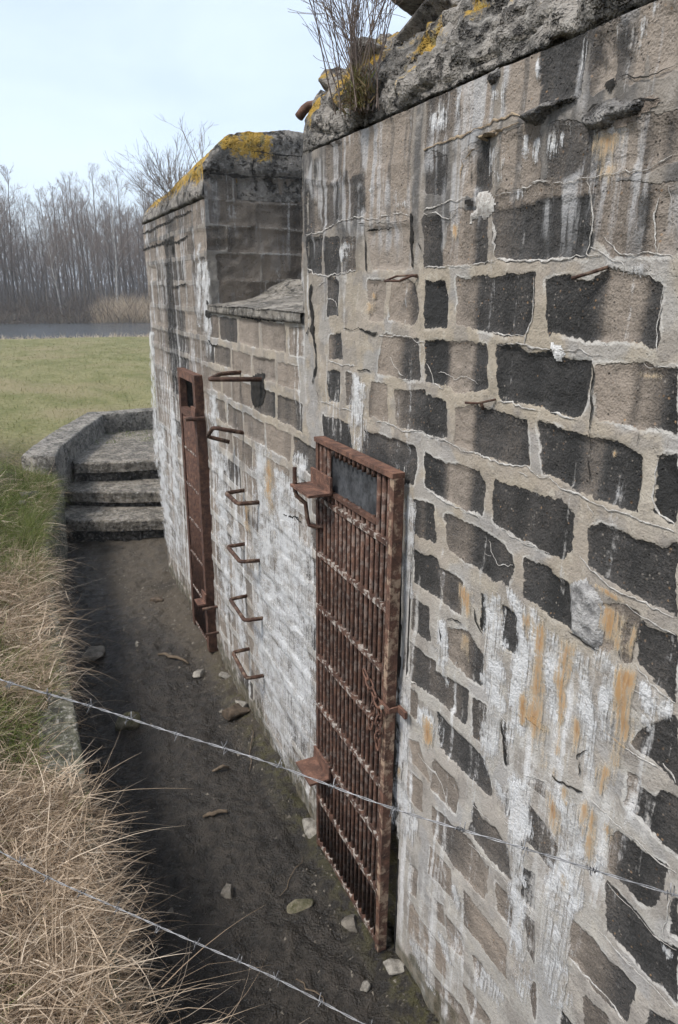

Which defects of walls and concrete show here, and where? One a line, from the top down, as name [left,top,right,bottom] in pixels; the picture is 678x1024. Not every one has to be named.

leakage [431,97,459,132]
leakage [476,149,505,185]
leakage [524,132,564,163]
crack [300,112,676,532]
rust [518,615,580,755]
crack [486,707,506,765]
rust [595,665,636,795]